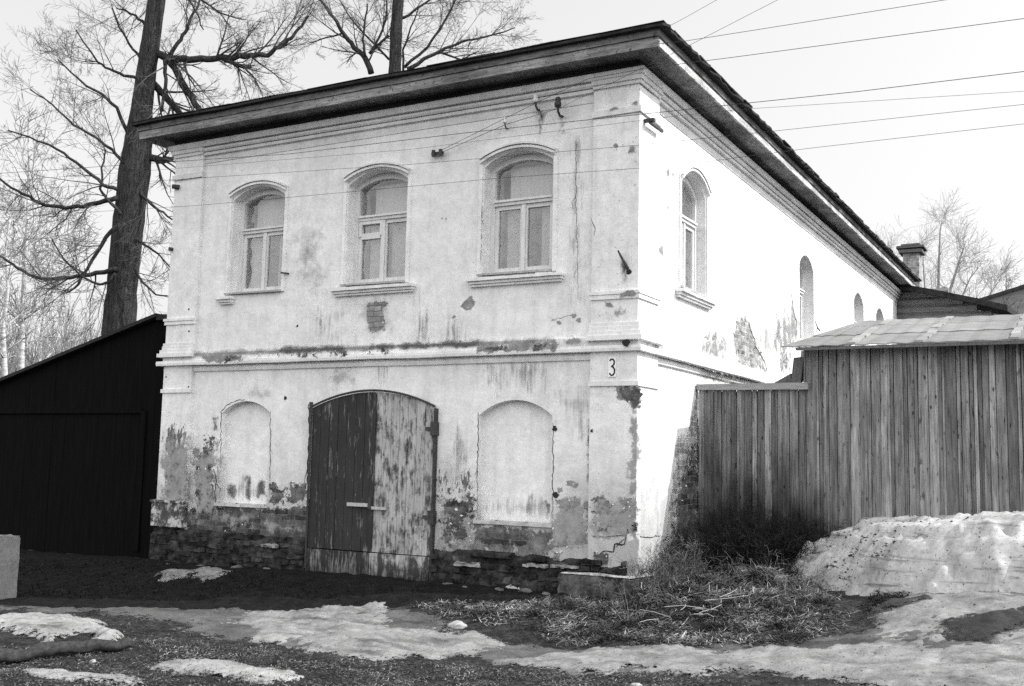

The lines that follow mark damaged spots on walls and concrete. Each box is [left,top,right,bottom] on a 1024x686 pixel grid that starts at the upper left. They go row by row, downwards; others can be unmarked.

crack [572,151,596,287]
water stain [195,338,554,355]
flaking render [367,301,388,332]
flaking render [453,296,475,318]
flaking render [702,307,800,383]
flaking render [157,416,309,538]
flaking render [436,386,643,567]
crack [593,524,666,555]